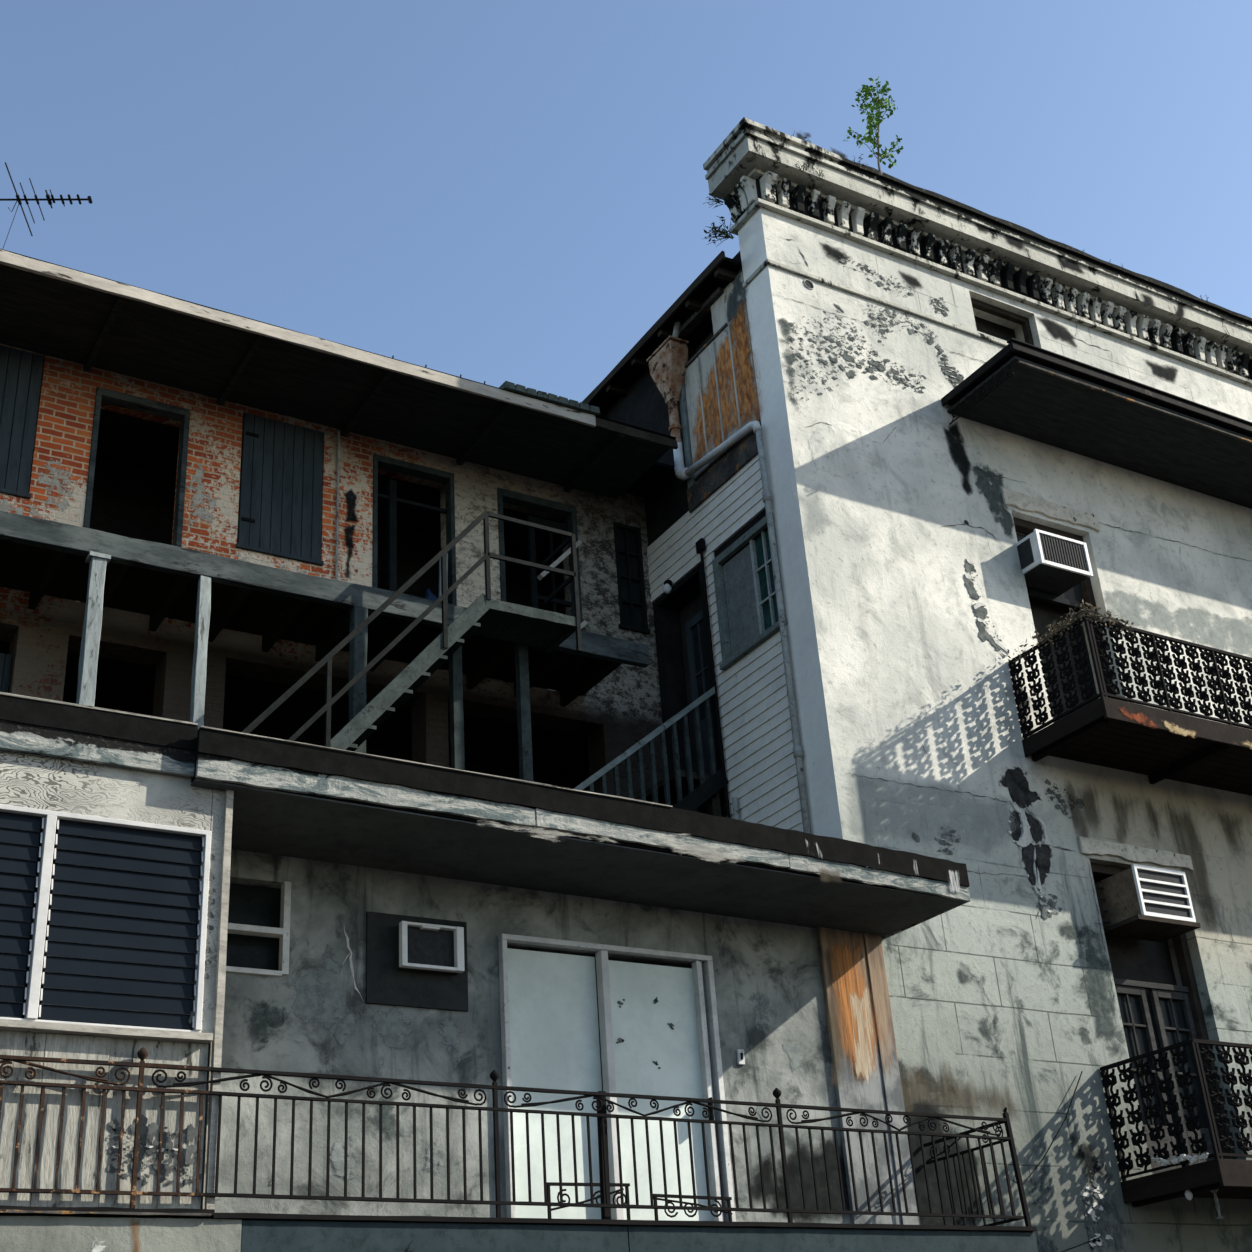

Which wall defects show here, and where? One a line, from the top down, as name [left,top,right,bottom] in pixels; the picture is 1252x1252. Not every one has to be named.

rust [693,305,759,462]
peeling [788,255,964,400]
damp [944,423,1014,537]
spalling [963,557,1009,658]
rust [1120,708,1156,728]
peeling [661,834,738,862]
spalling [999,767,1083,920]
damp [248,1001,286,1050]
crack [343,927,363,1000]
rust [830,944,876,1081]
damp [1061,922,1125,1053]
damp [369,1086,409,1138]